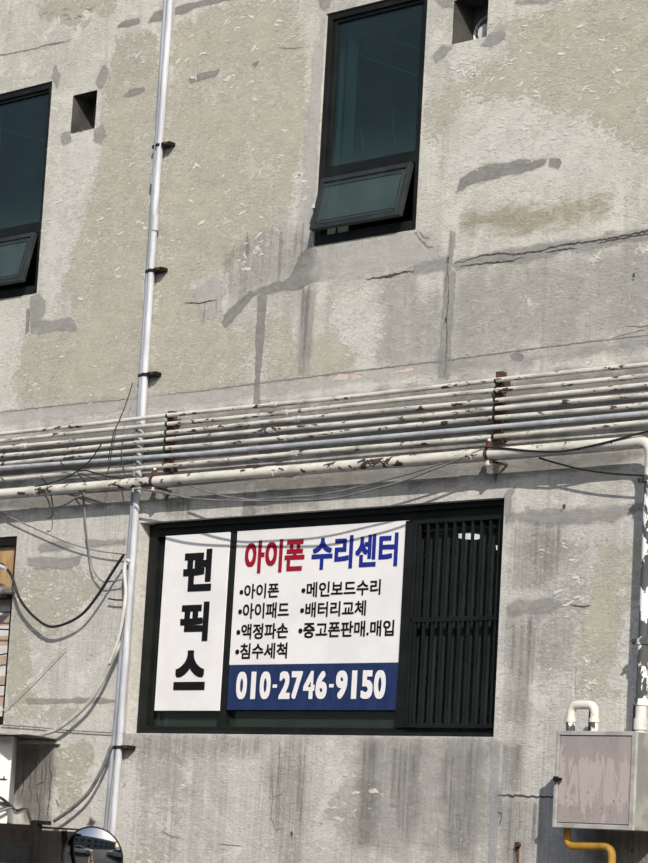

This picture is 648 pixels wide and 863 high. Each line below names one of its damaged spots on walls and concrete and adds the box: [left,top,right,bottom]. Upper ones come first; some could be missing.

crack [4,229,648,412]
crack [498,794,553,824]